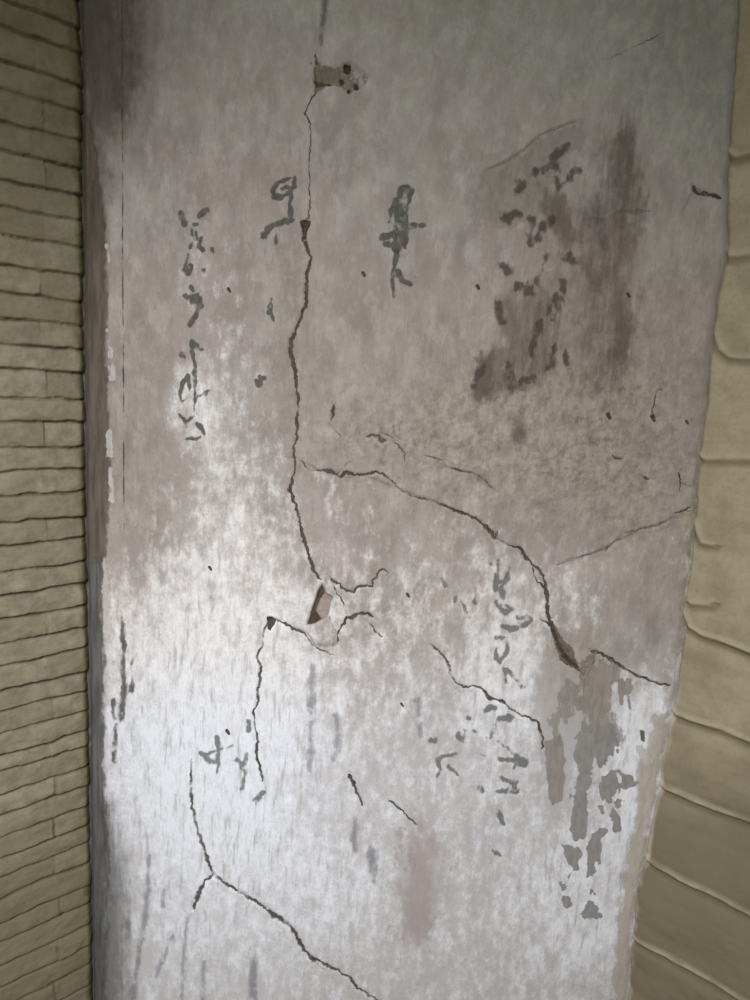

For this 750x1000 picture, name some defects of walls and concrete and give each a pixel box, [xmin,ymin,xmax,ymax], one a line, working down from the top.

flaking render [310,63,366,94]
crack [252,54,670,782]
flaking render [307,584,333,624]
peeling [545,620,638,919]
crack [190,770,377,1000]